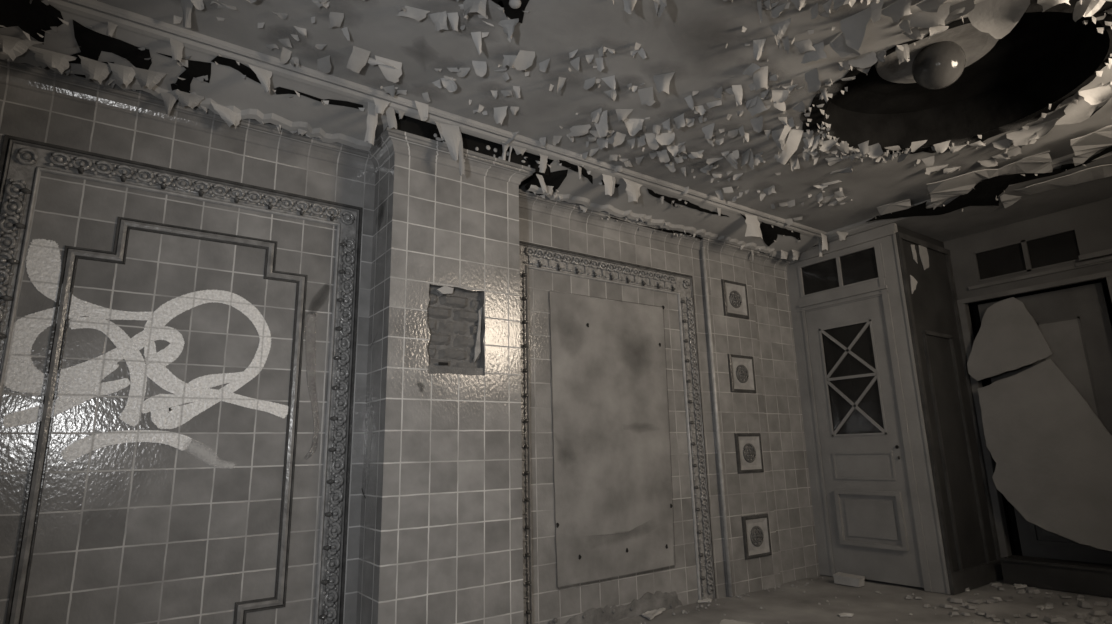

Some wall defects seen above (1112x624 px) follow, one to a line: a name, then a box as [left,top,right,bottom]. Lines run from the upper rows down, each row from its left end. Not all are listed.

peeling [173,0,257,28]
peeling [258,0,1112,226]
spalling [436,286,454,295]